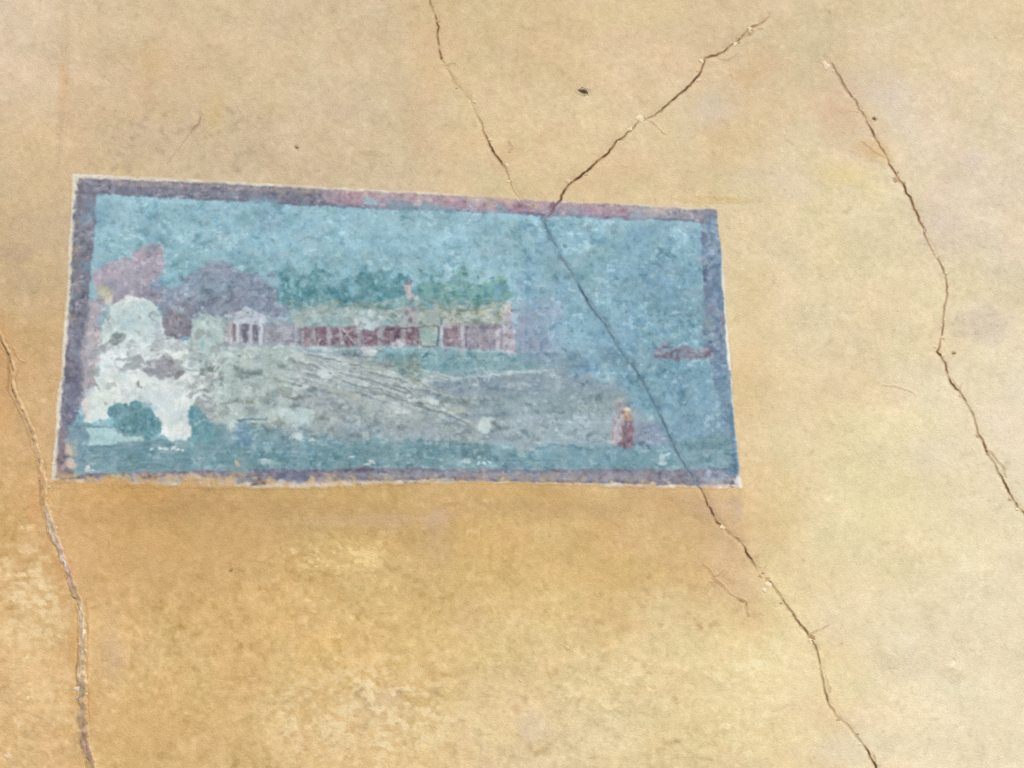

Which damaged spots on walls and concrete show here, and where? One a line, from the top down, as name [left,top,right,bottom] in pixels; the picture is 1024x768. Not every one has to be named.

crack [0,329,97,768]
crack [428,0,880,768]
crack [821,55,1024,516]